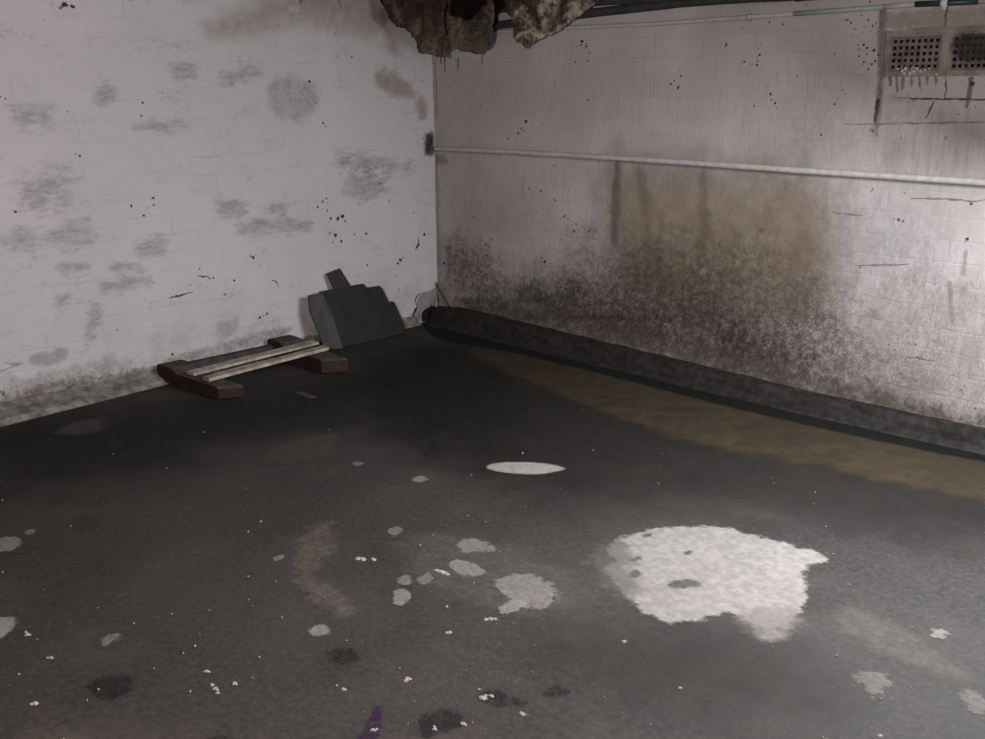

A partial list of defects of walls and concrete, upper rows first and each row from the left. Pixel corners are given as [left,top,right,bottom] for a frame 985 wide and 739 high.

water stain [441,164,895,405]
water stain [393,324,985,524]